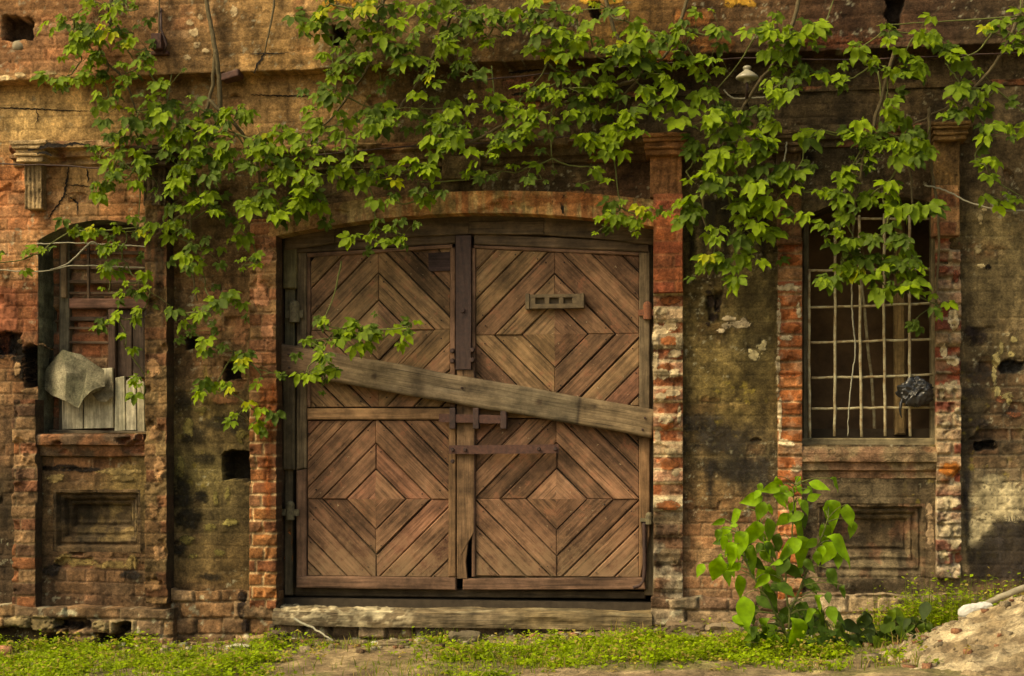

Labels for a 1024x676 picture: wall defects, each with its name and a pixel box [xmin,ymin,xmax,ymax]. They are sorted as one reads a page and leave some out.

crack [0,107,90,218]
spalling [0,334,55,394]
spalling [939,332,1024,418]
water stain [182,409,248,464]
spalling [971,438,997,451]
water stain [173,477,208,556]